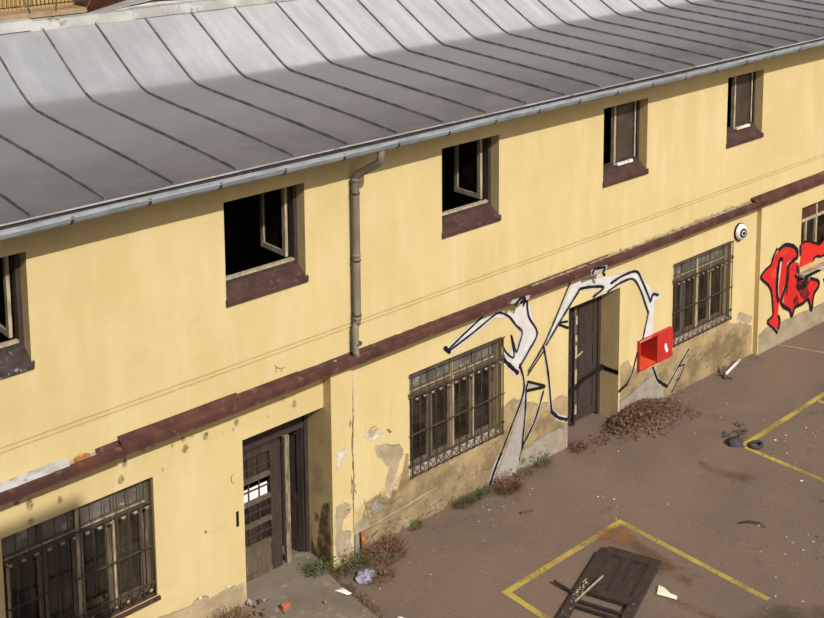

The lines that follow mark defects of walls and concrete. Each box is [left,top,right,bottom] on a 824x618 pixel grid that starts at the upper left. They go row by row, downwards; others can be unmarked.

flaking render [334,395,568,565]
flaking render [158,583,246,618]